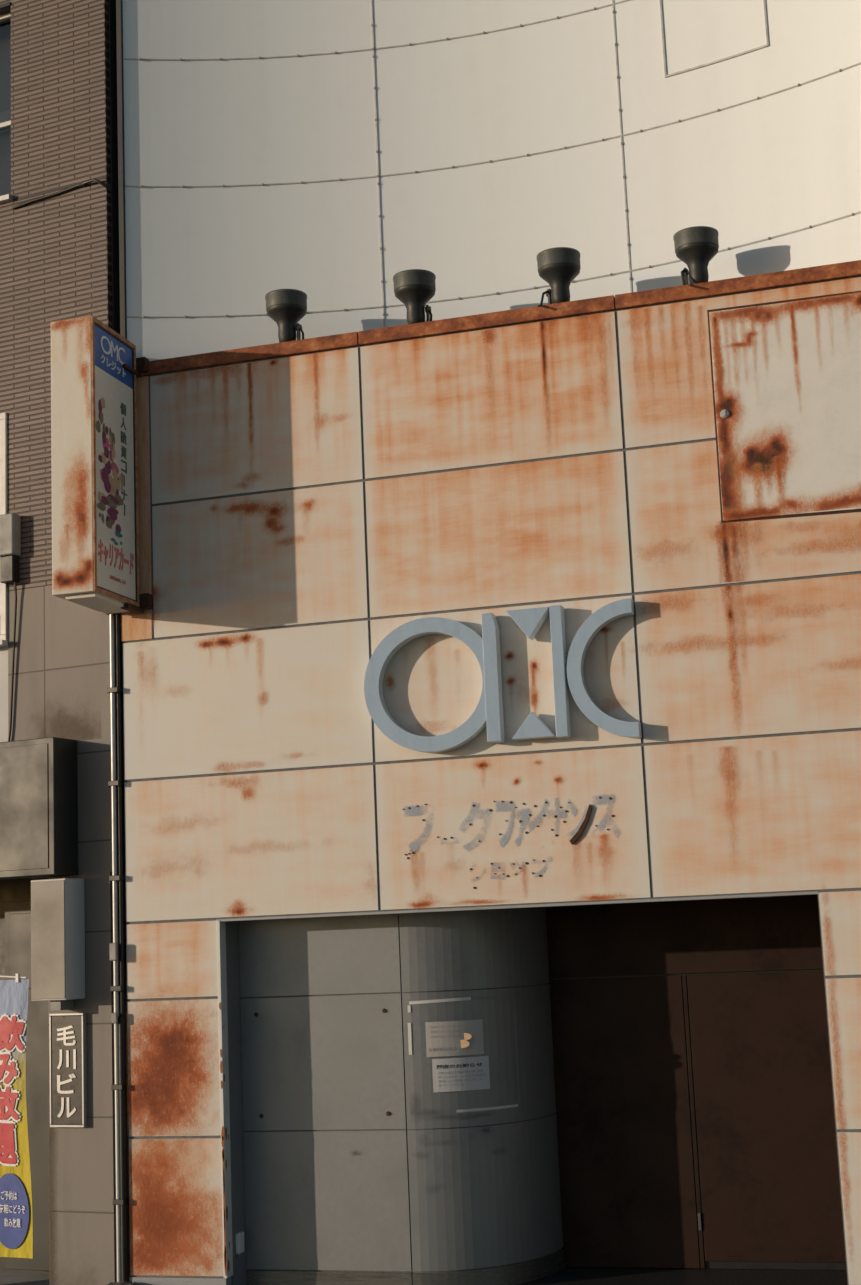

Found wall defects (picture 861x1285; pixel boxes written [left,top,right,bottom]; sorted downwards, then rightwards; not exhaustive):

rust [51,316,91,379]
rust [539,321,548,405]
rust [217,363,253,443]
rust [66,463,88,537]
rust [212,503,295,544]
rust [684,292,861,699]
rust [54,559,93,589]
rust [199,634,251,648]
rust [126,1009,221,1276]